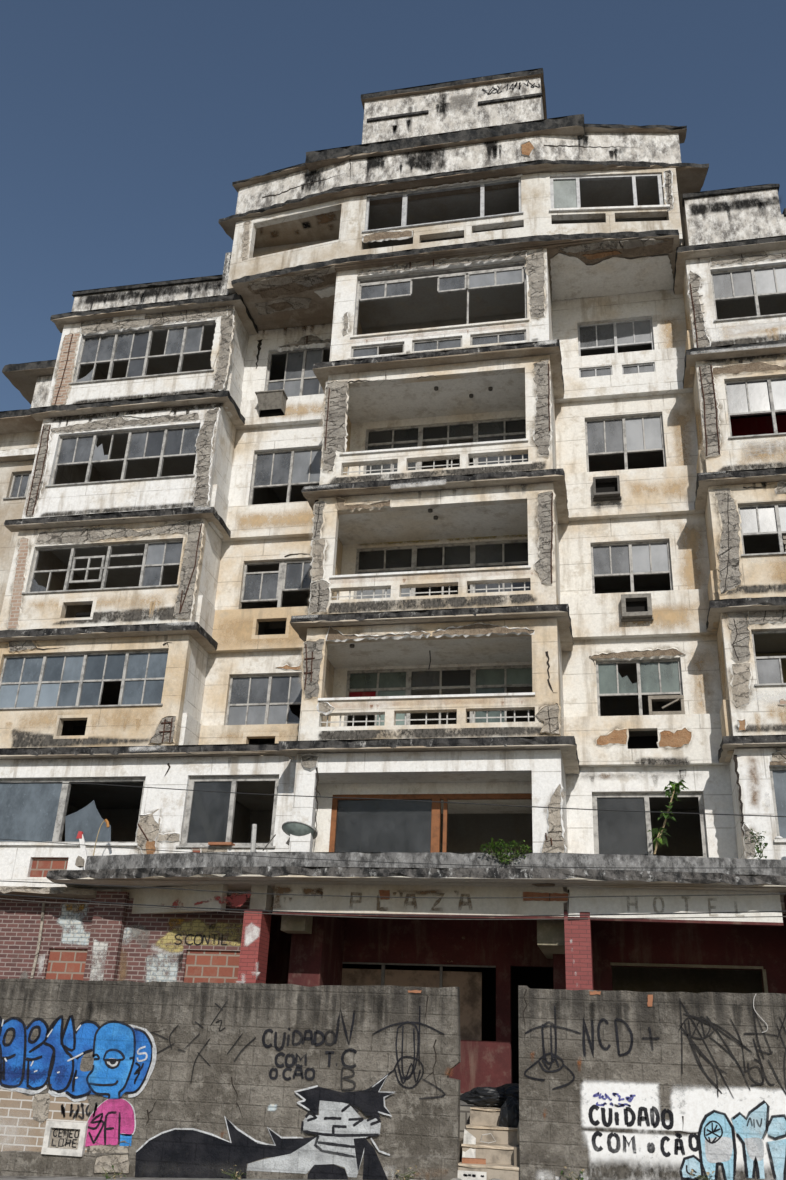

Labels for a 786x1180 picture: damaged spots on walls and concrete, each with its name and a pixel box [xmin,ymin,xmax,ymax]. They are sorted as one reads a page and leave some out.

leakage [367,155,384,174]
leakage [400,148,445,171]
leakage [301,170,323,191]
spalling [690,284,725,456]
spalling [25,425,51,515]
spalling [168,524,202,624]
peeling [729,663,753,733]
peeling [596,728,629,748]
peeling [657,726,693,750]